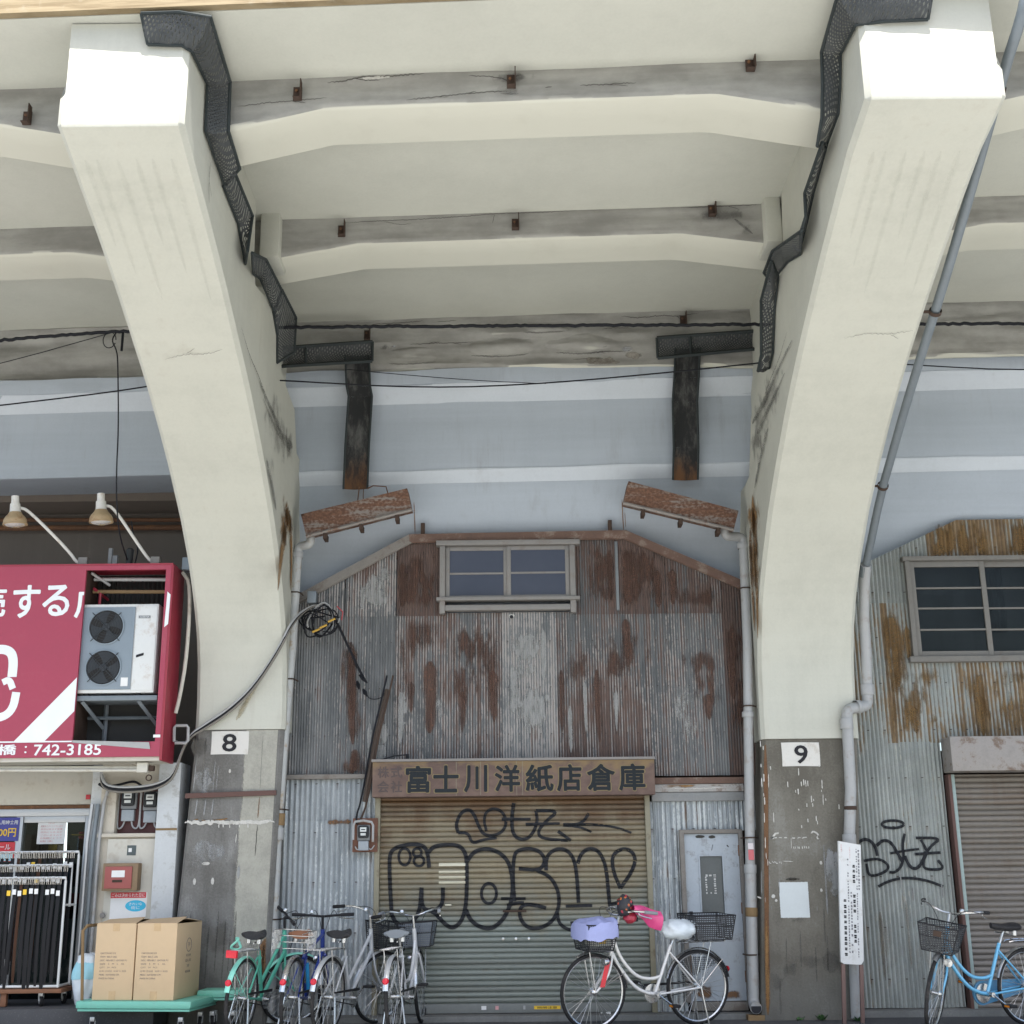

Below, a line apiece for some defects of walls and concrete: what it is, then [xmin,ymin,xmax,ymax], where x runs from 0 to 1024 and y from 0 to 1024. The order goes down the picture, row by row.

crack [245,73,521,106]
water stain [260,384,293,453]
water stain [752,342,791,488]
corrosion [278,503,293,588]
corrosion [748,496,759,637]
corrosion [934,523,987,556]
corrosion [1010,525,1024,553]
corrosion [401,622,437,733]
corrosion [454,630,498,733]
corrosion [559,619,636,742]
corrosion [683,652,714,720]
corrosion [884,616,936,733]